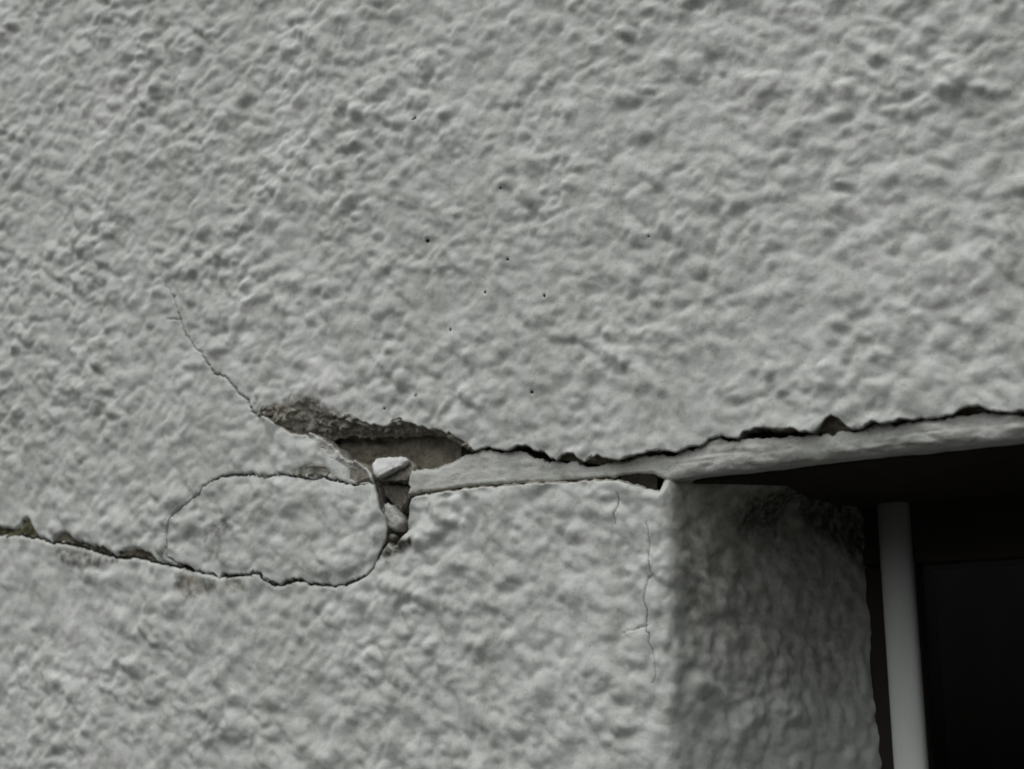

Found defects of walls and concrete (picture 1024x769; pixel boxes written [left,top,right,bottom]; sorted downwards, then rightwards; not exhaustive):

crack [162,278,261,418]
spalling [257,397,477,483]
crack [727,431,856,442]
crack [417,447,679,524]
crack [0,471,373,588]